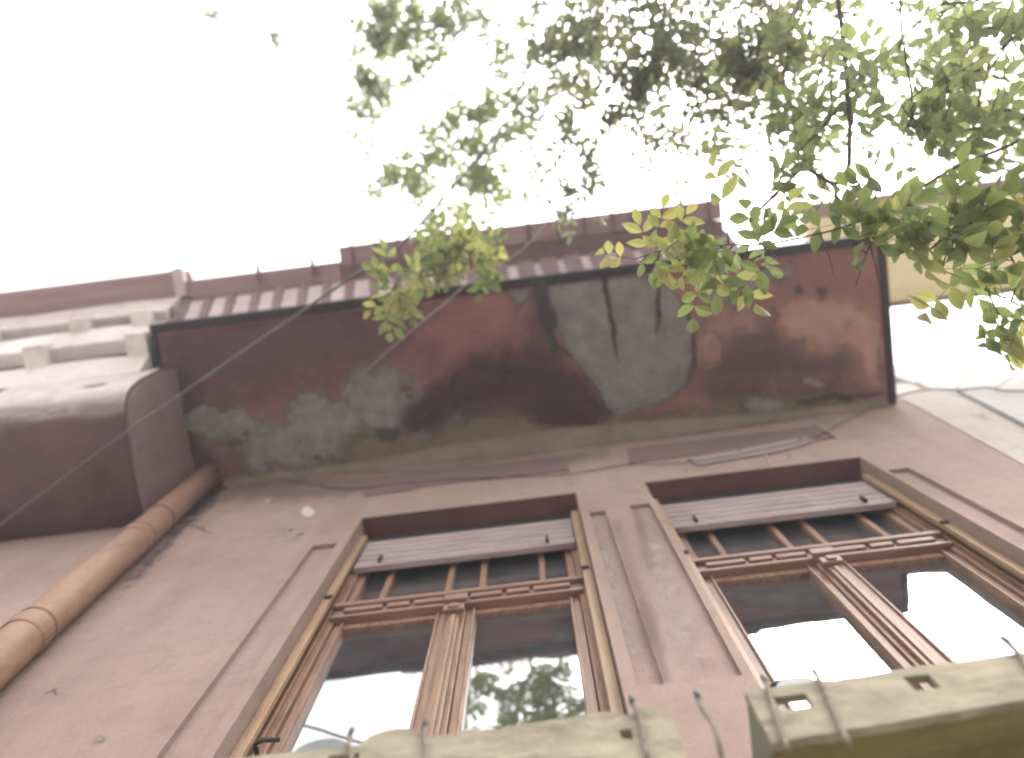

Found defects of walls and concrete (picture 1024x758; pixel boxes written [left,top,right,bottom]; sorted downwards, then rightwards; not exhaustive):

spalling [184,367,572,474]
water stain [402,303,609,429]
crack [601,276,619,364]
spalling [547,262,886,424]